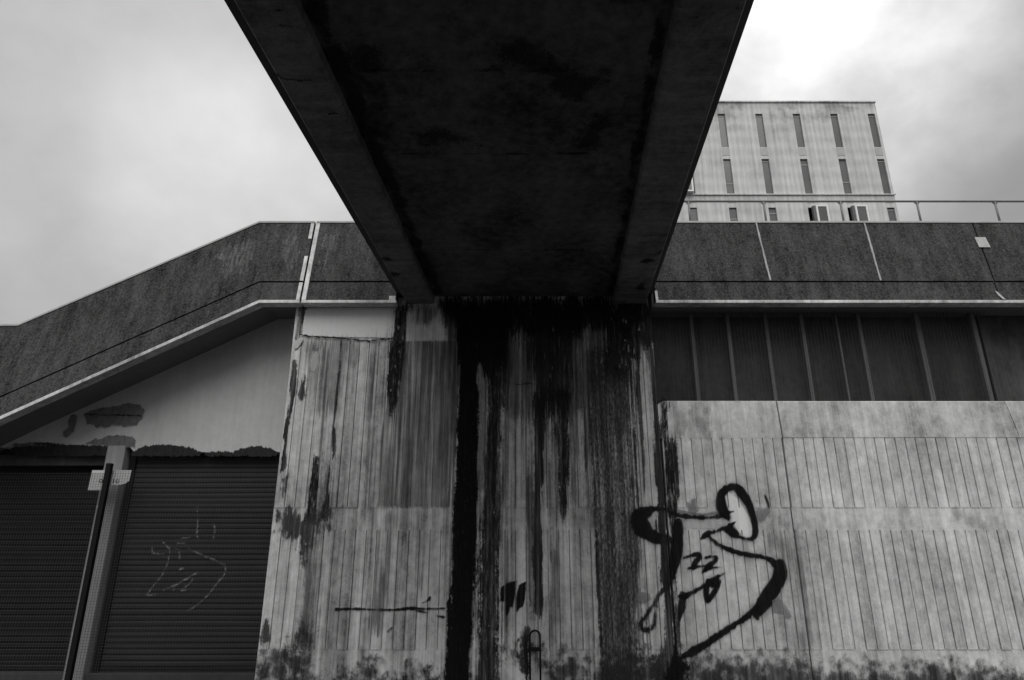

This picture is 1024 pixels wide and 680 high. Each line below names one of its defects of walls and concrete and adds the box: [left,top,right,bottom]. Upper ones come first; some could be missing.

flaking render [10,402,280,457]
damp [280,340,342,525]
damp [364,303,1024,680]